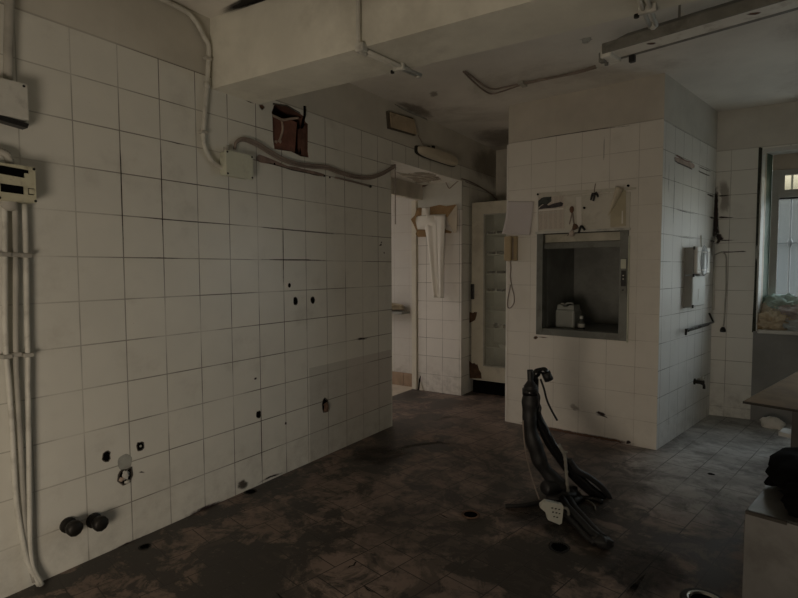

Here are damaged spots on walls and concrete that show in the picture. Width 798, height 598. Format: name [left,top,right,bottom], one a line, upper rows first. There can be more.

rust [469,361,482,379]